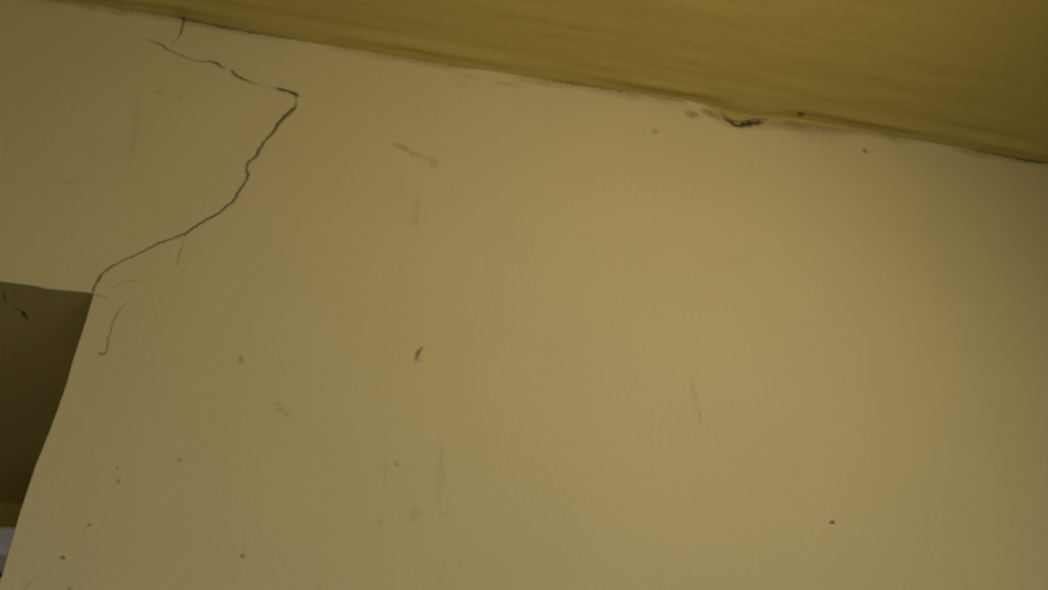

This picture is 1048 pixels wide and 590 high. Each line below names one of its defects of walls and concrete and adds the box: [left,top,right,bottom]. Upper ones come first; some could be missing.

crack [140,89,298,253]